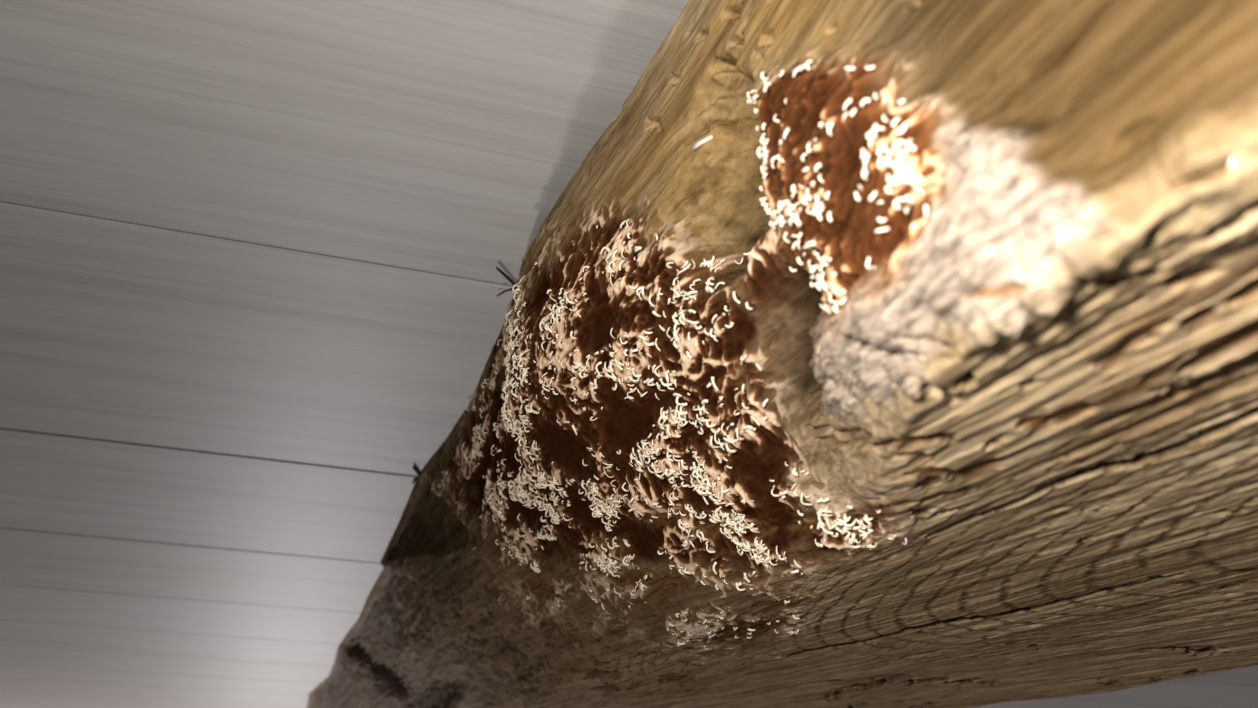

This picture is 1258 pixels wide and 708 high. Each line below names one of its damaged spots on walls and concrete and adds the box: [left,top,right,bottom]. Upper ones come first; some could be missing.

peeling [747,60,928,315]
peeling [462,219,803,611]
peeling [769,462,907,549]
peeling [667,600,800,650]
crack [787,572,1187,659]